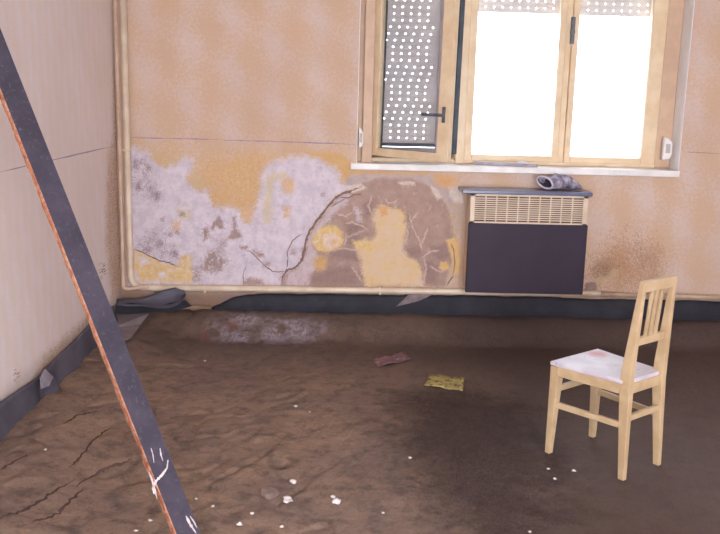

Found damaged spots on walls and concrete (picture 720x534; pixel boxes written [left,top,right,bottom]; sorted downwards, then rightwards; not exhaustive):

water stain [99,20,459,304]
flaking render [124,143,467,288]
crack [242,186,362,285]
water stain [577,224,681,299]
water stain [198,311,336,350]
crack [0,428,131,522]